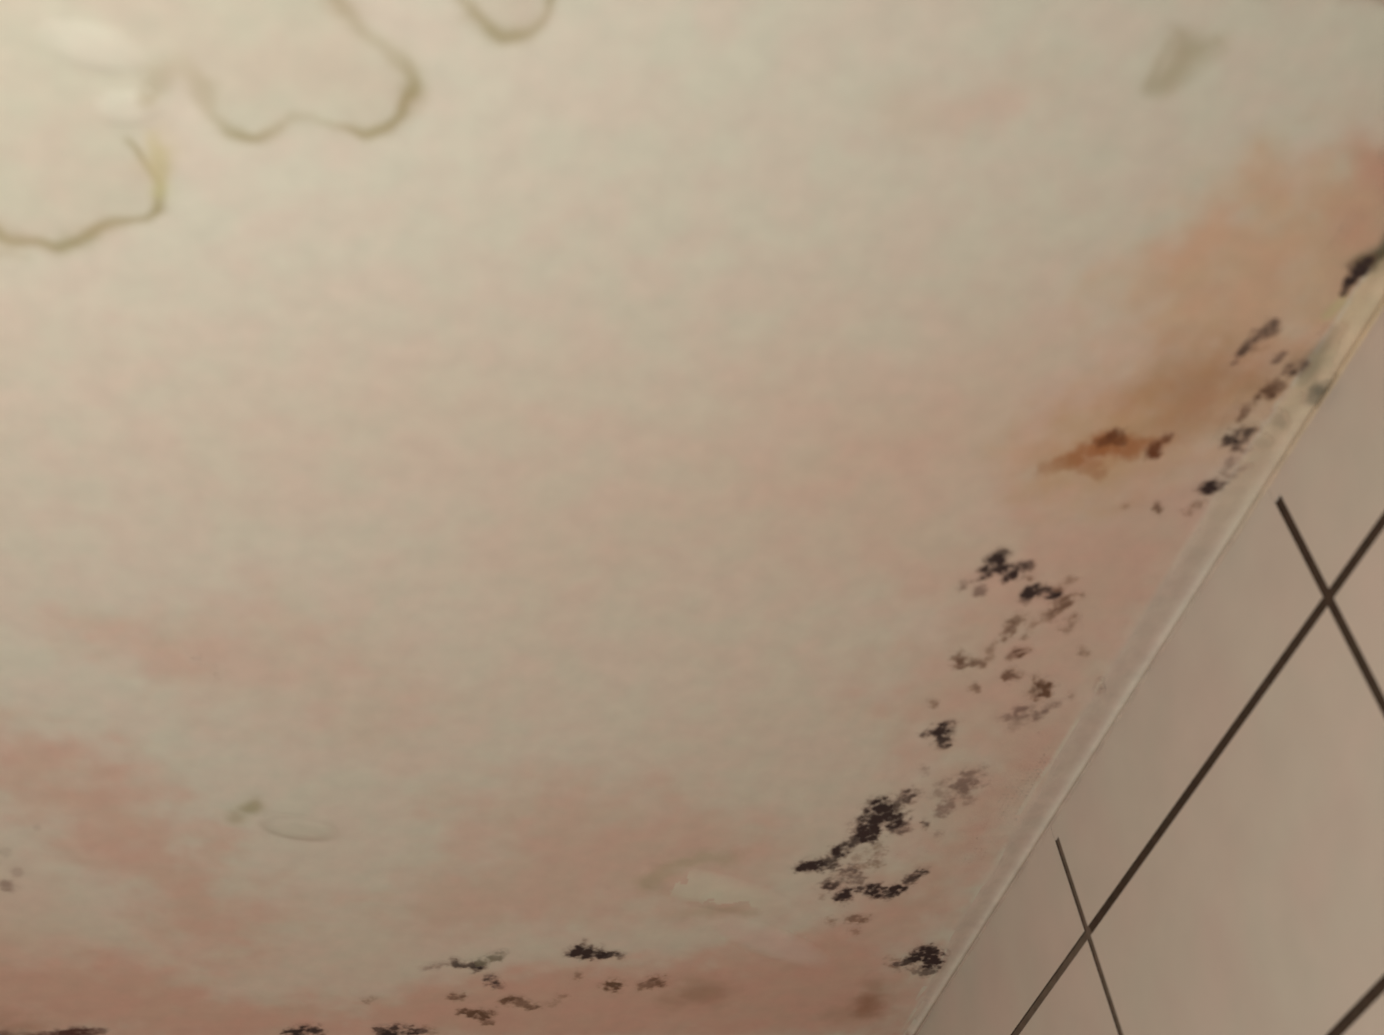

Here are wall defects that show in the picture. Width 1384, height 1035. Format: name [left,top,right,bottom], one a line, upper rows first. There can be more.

damp [0,0,443,270]
damp [447,0,576,56]
corrosion [970,315,1311,529]
damp [23,565,503,779]
damp [668,81,1384,1035]
damp [0,695,932,1035]